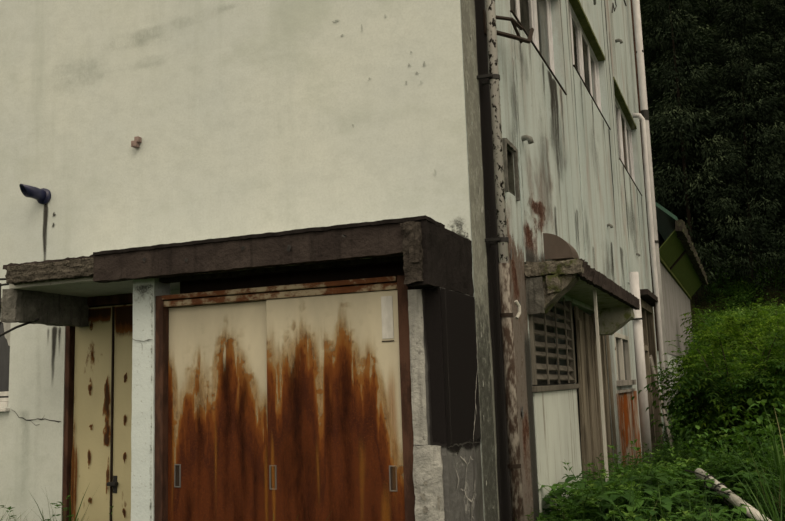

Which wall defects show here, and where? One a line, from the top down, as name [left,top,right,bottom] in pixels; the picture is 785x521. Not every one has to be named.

water stain [543,0,582,172]
water stain [575,0,644,238]
water stain [43,204,56,261]
corrosion [524,198,545,256]
corrosion [88,305,133,335]
crack [12,410,61,426]
corrosion [103,376,111,447]
corrosion [168,321,405,521]
crack [448,316,485,521]
corrosion [621,393,634,456]